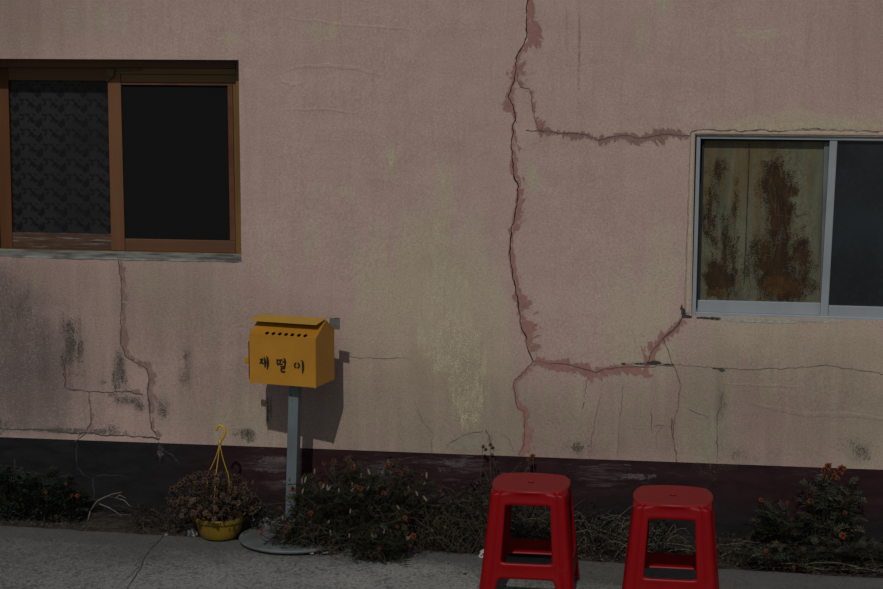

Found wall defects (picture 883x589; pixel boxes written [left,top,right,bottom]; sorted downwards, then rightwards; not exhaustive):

crack [415,0,883,462]
corrosion [697,142,821,302]
crack [0,257,183,497]
water stain [103,344,169,422]